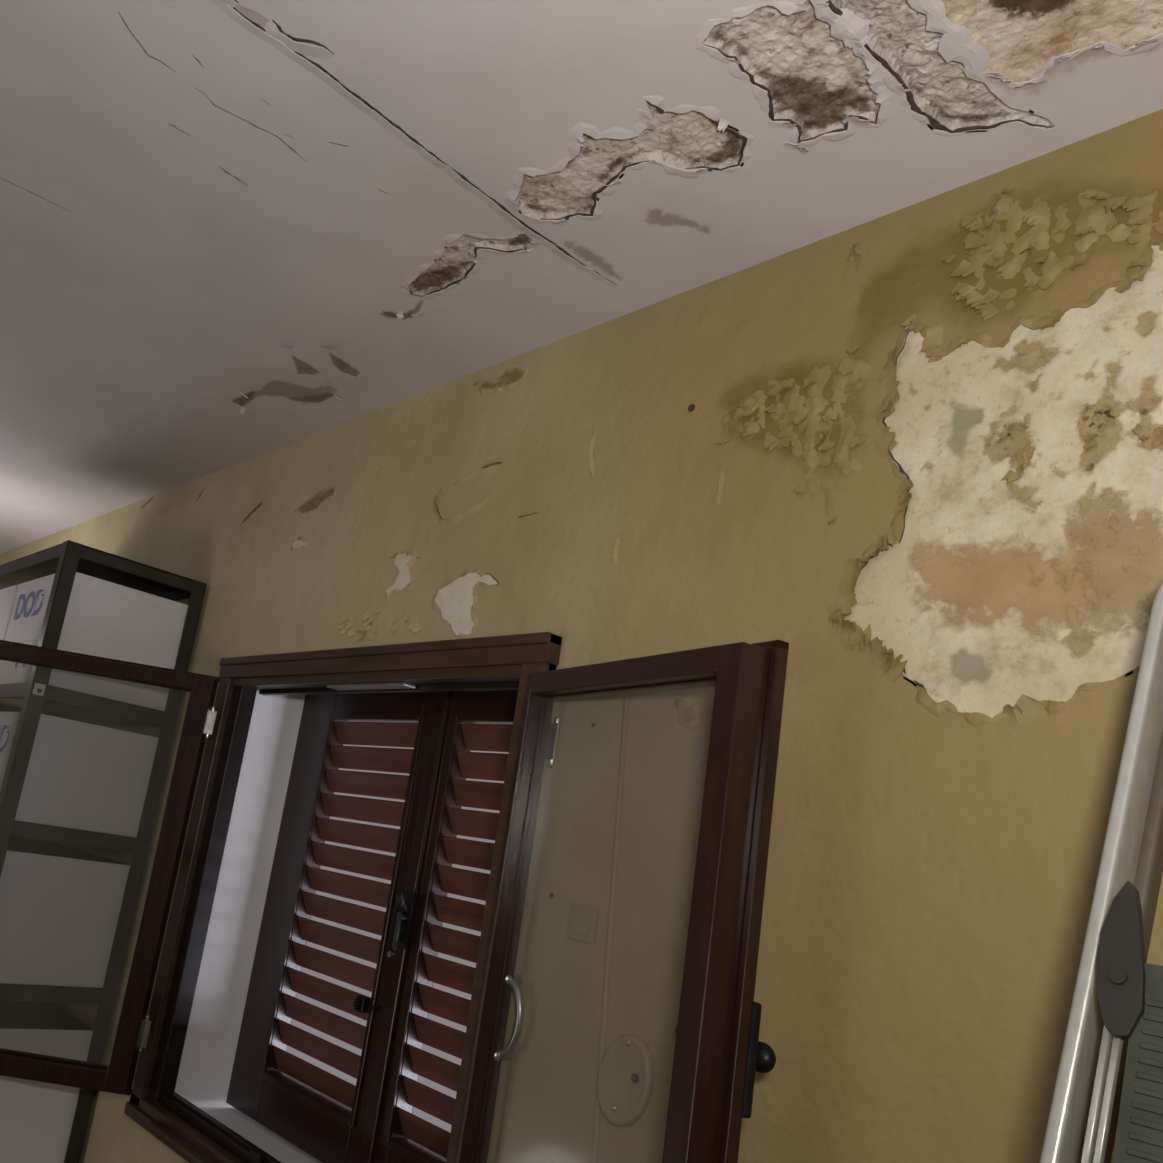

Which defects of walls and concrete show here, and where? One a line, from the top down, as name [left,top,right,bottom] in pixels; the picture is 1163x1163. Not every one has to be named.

water stain [989,0,1073,17]
crack [118,11,306,161]
spalling [695,0,1163,156]
crack [211,0,623,291]
spalling [502,95,755,226]
spalling [382,233,543,319]
flaking render [233,385,260,415]
flaking render [280,344,342,405]
flaking render [321,345,359,376]
peeling [825,243,1163,728]
peeling [384,549,417,599]
peeling [431,568,498,639]